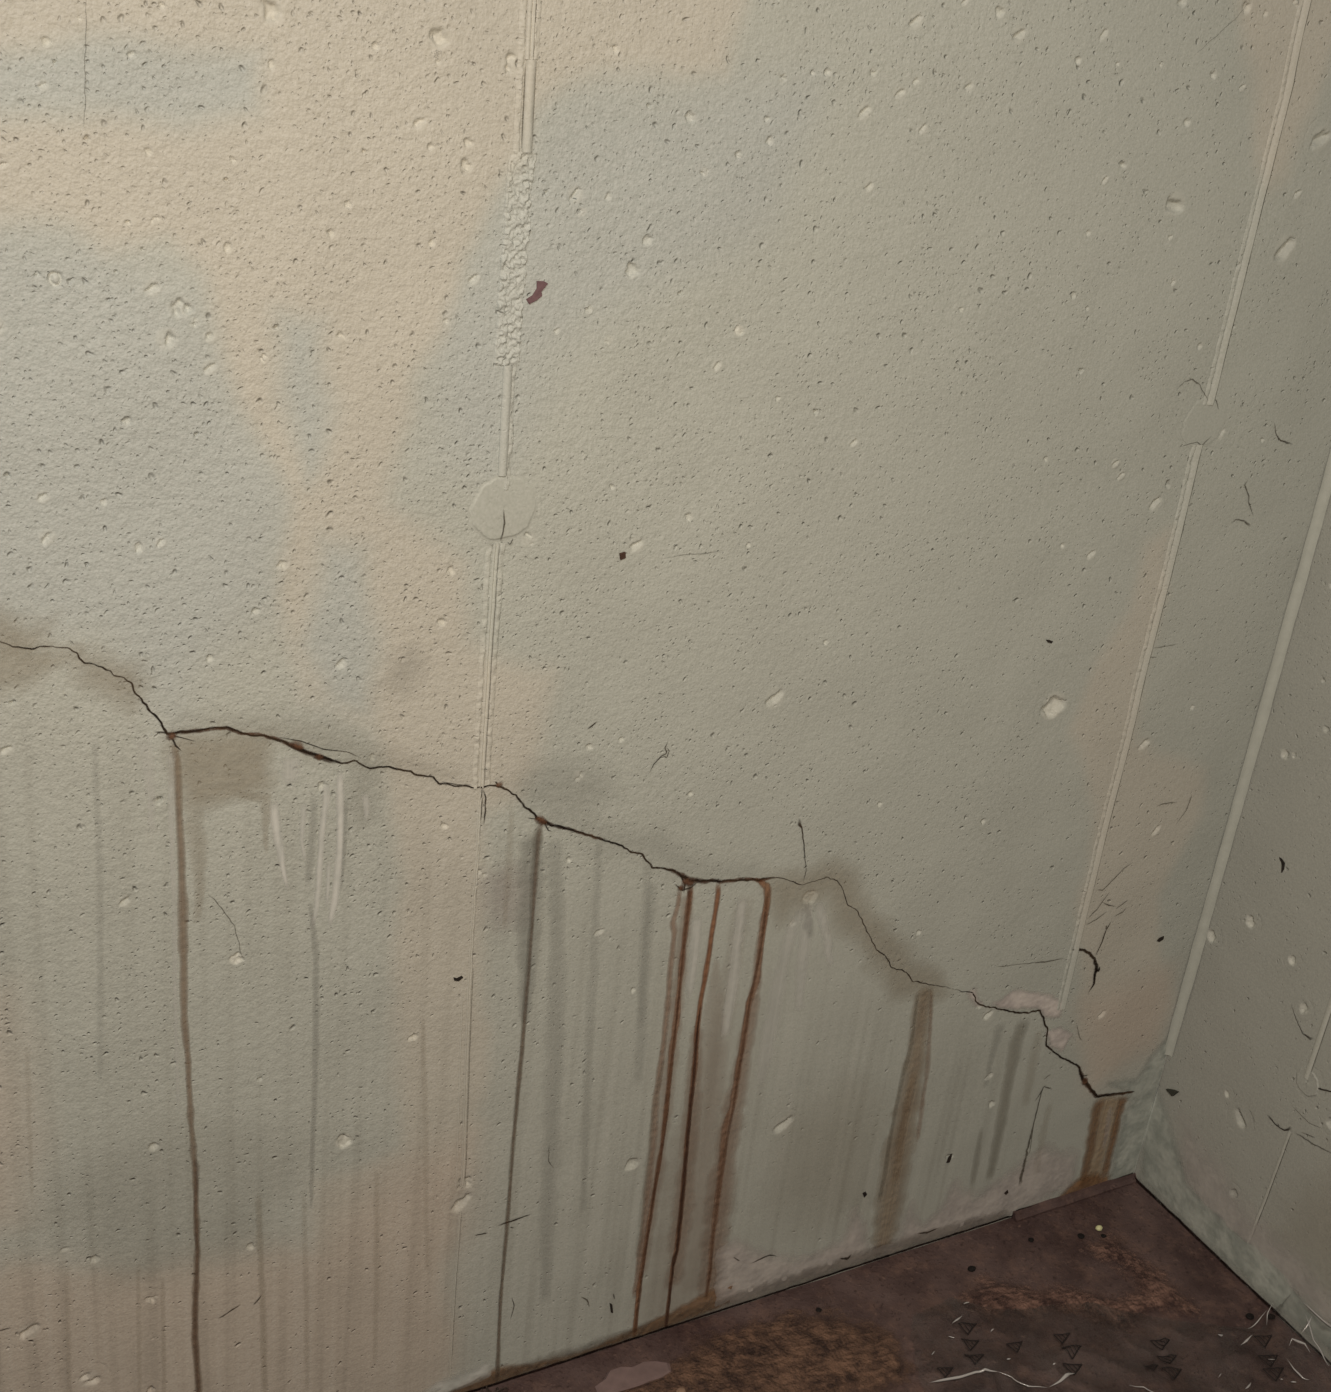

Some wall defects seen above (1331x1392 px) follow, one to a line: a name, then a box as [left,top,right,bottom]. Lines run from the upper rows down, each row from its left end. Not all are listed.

leakage [271,807,287,884]
leakage [300,777,343,923]
crack [0,641,1134,1181]
rust [174,752,200,1392]
rust [453,834,771,1392]
rust [1062,1100,1125,1196]
leakage [429,1365,488,1392]